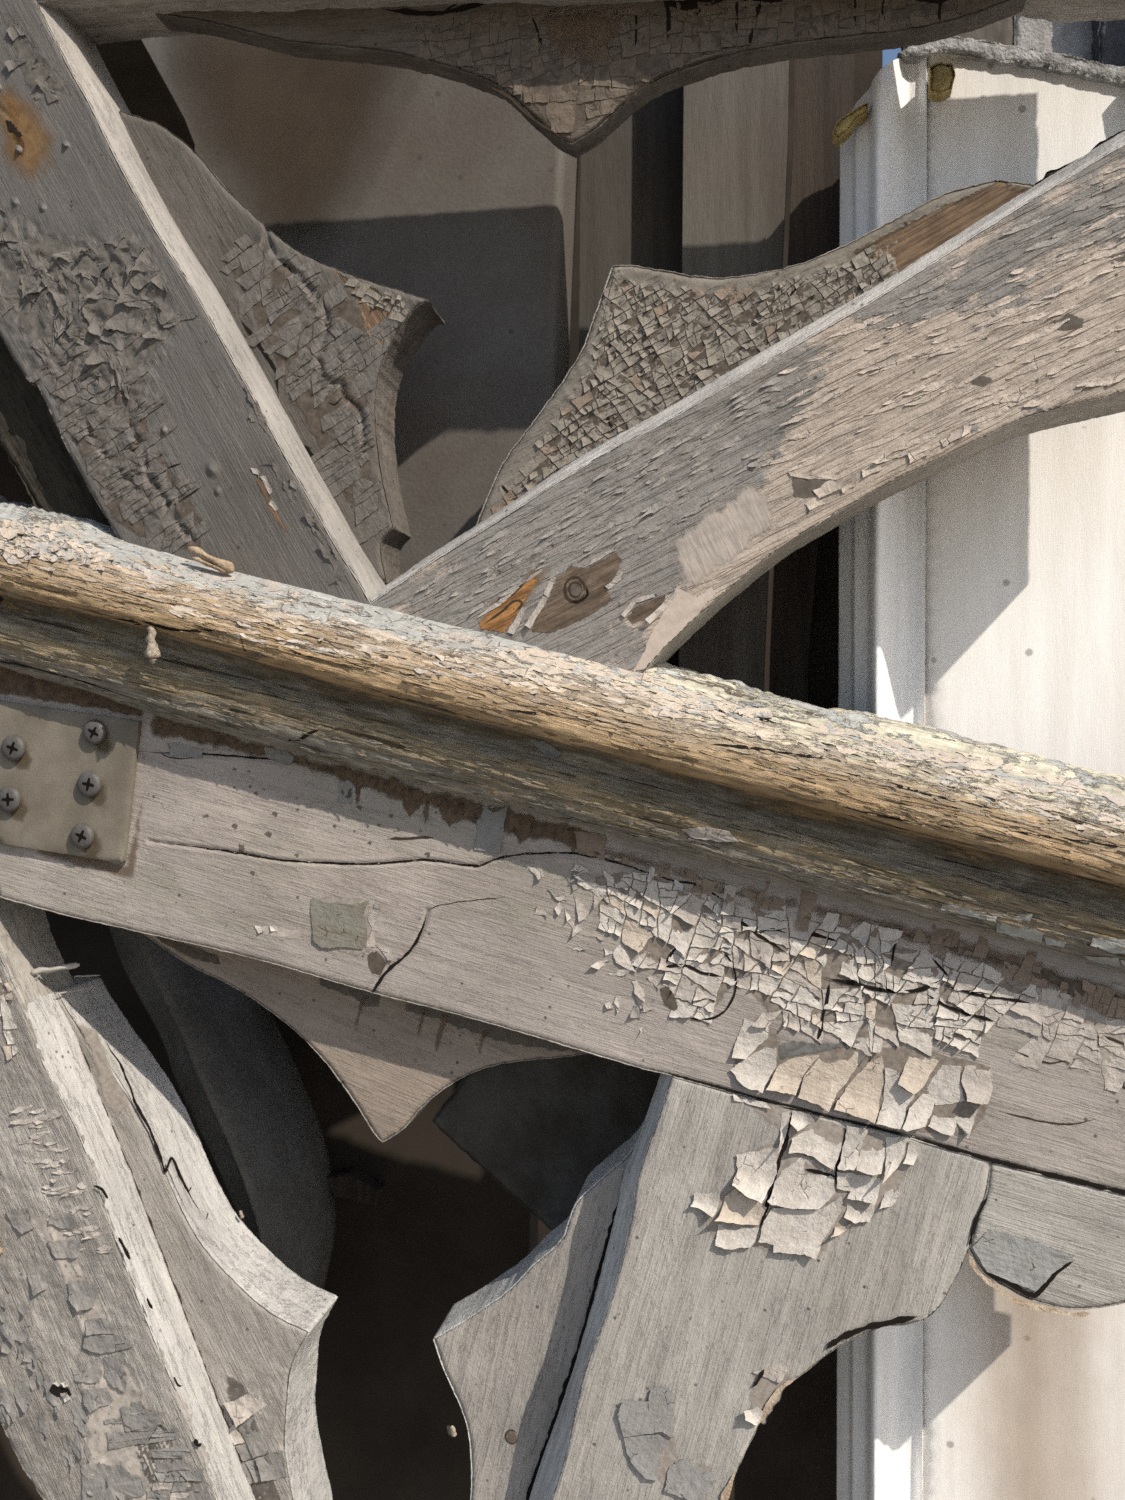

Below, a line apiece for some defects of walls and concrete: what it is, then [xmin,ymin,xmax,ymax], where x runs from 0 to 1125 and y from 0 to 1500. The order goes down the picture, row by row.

peeling [412,0,1125,133]
corrosion [1,94,46,173]
peeling [804,722,1125,836]
peeling [0,973,19,1060]
peeling [527,864,678,1034]
crack [150,836,1125,1064]
peeling [997,988,1125,1093]
peeling [690,1019,993,1259]
peeling [0,1105,207,1500]
crack [526,1200,619,1500]
peeling [973,1230,1074,1291]
peeling [223,1378,287,1500]